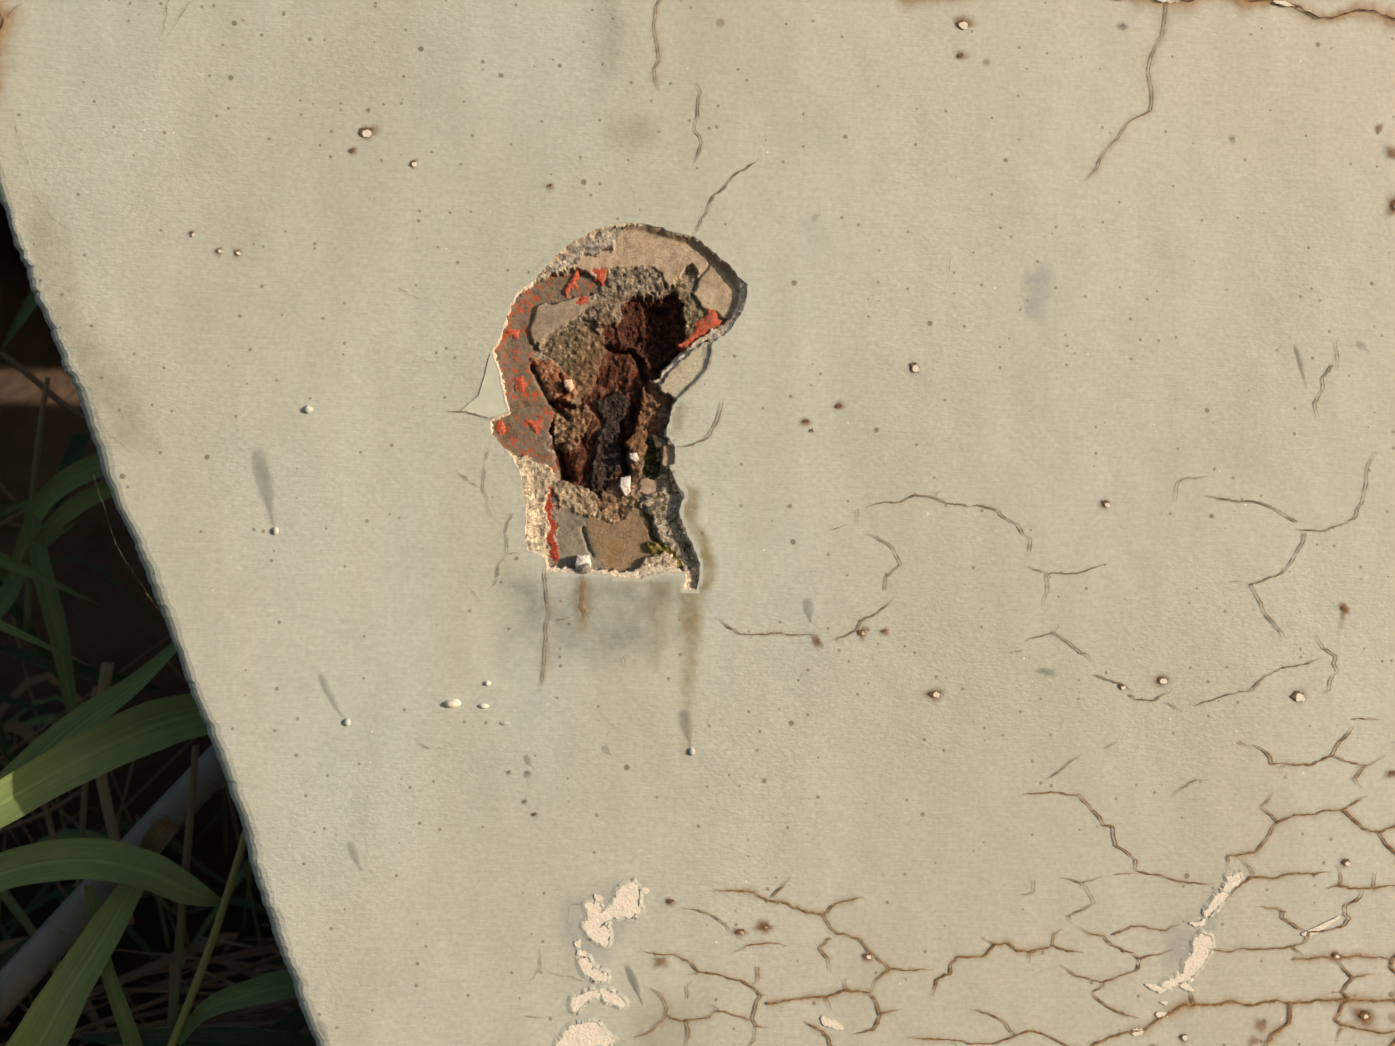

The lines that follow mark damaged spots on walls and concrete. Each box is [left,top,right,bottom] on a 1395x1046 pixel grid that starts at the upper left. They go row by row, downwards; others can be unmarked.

crack [0,3,22,45]
crack [653,0,661,91]
crack [694,83,702,163]
crack [696,160,758,232]
crack [1086,0,1194,180]
crack [1235,0,1395,23]
spalling [462,223,748,591]
crack [680,453,1376,710]
peeling [552,877,649,1046]
crack [634,718,1395,1046]
peeling [1145,870,1246,1018]